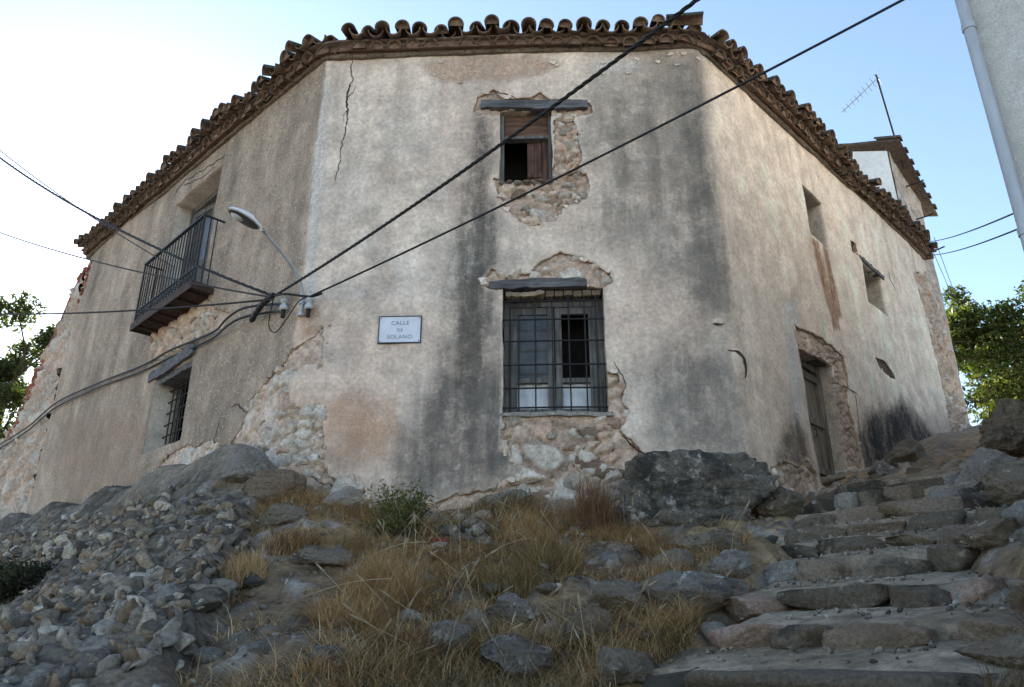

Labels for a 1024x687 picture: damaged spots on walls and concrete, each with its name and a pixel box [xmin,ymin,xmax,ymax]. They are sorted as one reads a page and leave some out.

crack [335,60,355,181]
spalling [425,57,595,226]
spalling [148,299,230,365]
spalling [152,325,374,507]
leakage [401,121,508,489]
spalling [419,368,640,513]
spalling [478,254,613,298]
spalling [792,325,862,470]
leakage [860,403,931,467]
spalling [913,271,971,432]